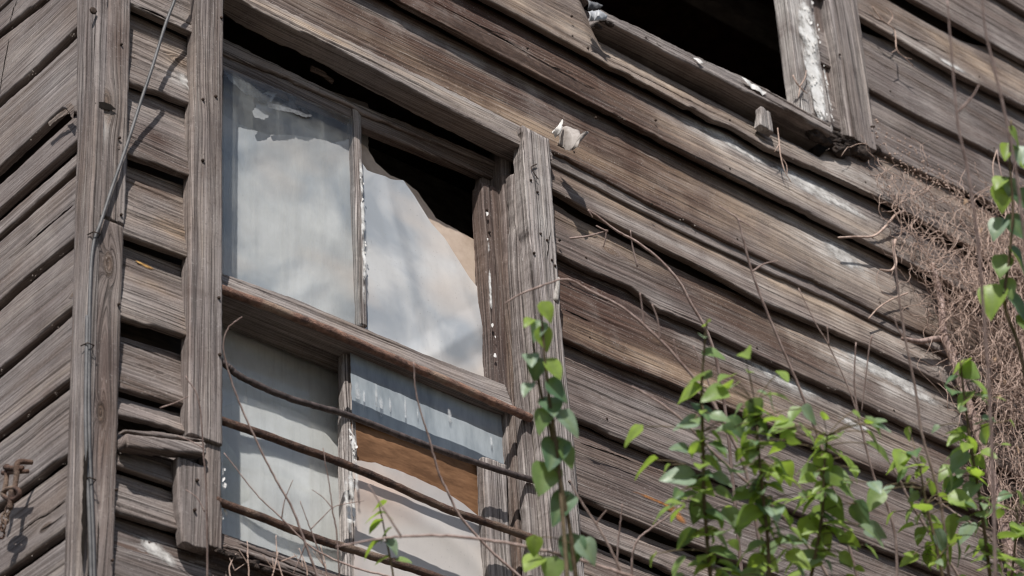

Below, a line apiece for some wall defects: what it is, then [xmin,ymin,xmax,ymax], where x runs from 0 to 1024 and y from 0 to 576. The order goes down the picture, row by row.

peeling [799,1,882,162]